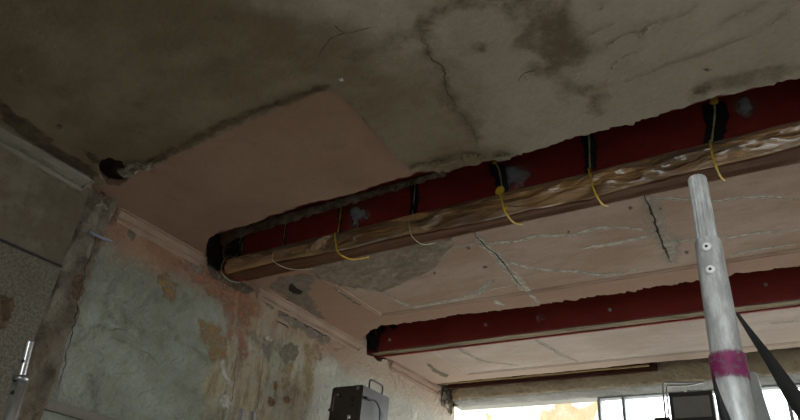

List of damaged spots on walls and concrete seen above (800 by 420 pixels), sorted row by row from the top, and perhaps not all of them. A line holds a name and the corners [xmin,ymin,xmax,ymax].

crack [421,31,478,149]
crack [386,195,697,308]
flaking render [255,335,299,363]
flaking render [263,274,329,343]